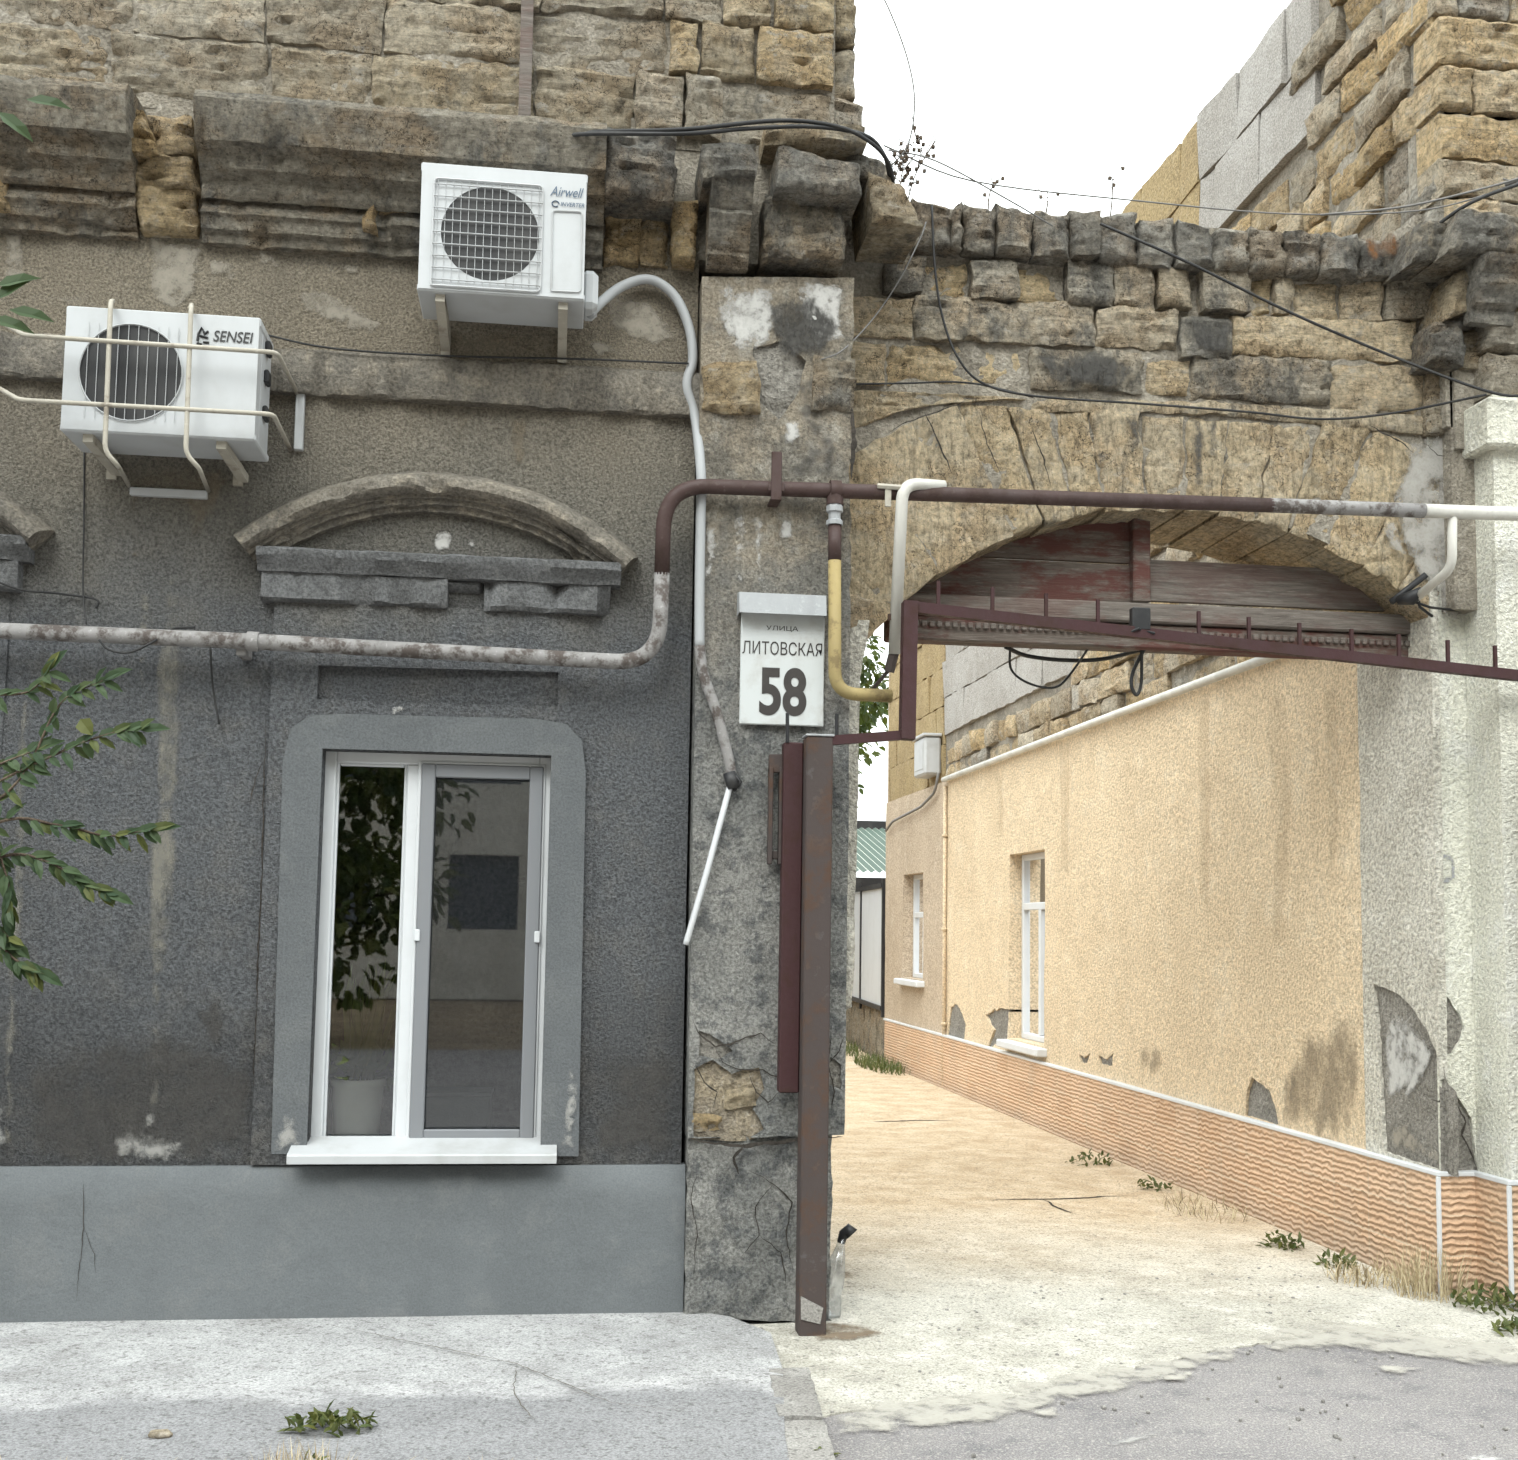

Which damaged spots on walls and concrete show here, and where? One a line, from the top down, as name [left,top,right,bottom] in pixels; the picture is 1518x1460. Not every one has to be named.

water stain [118,1139,180,1155]
flaking render [691,1031,764,1141]
crack [691,1022,955,1283]
flaking render [1248,1079,1278,1124]
flaking render [1377,985,1476,1177]